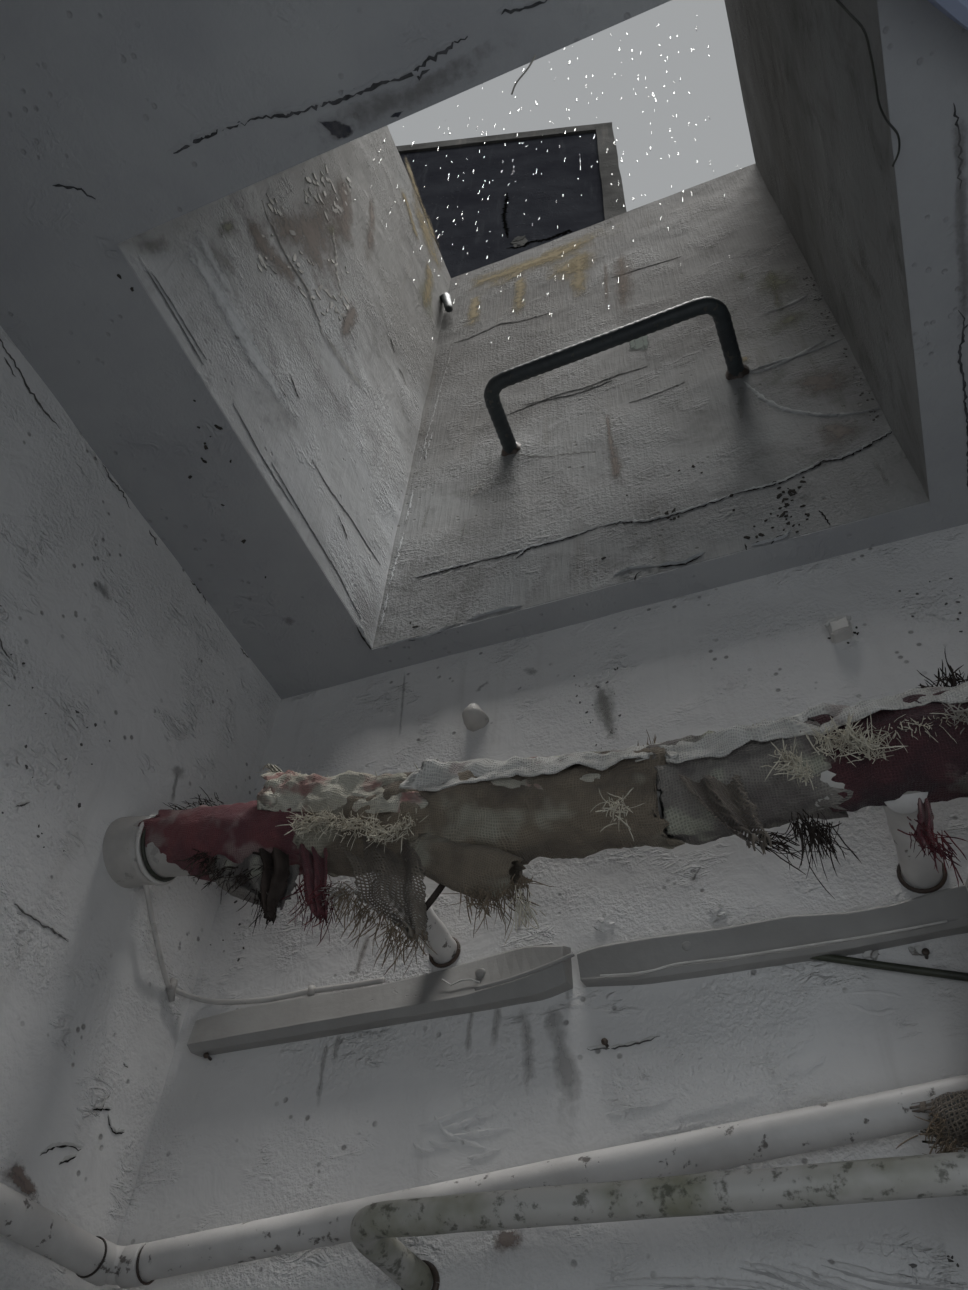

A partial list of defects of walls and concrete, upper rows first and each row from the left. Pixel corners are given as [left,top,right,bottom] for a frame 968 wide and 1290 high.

crack [496,0,547,15]
crack [168,33,468,154]
damp [321,121,352,139]
crack [953,103,963,188]
crack [145,267,207,365]
crack [958,310,968,487]
crack [233,342,893,650]